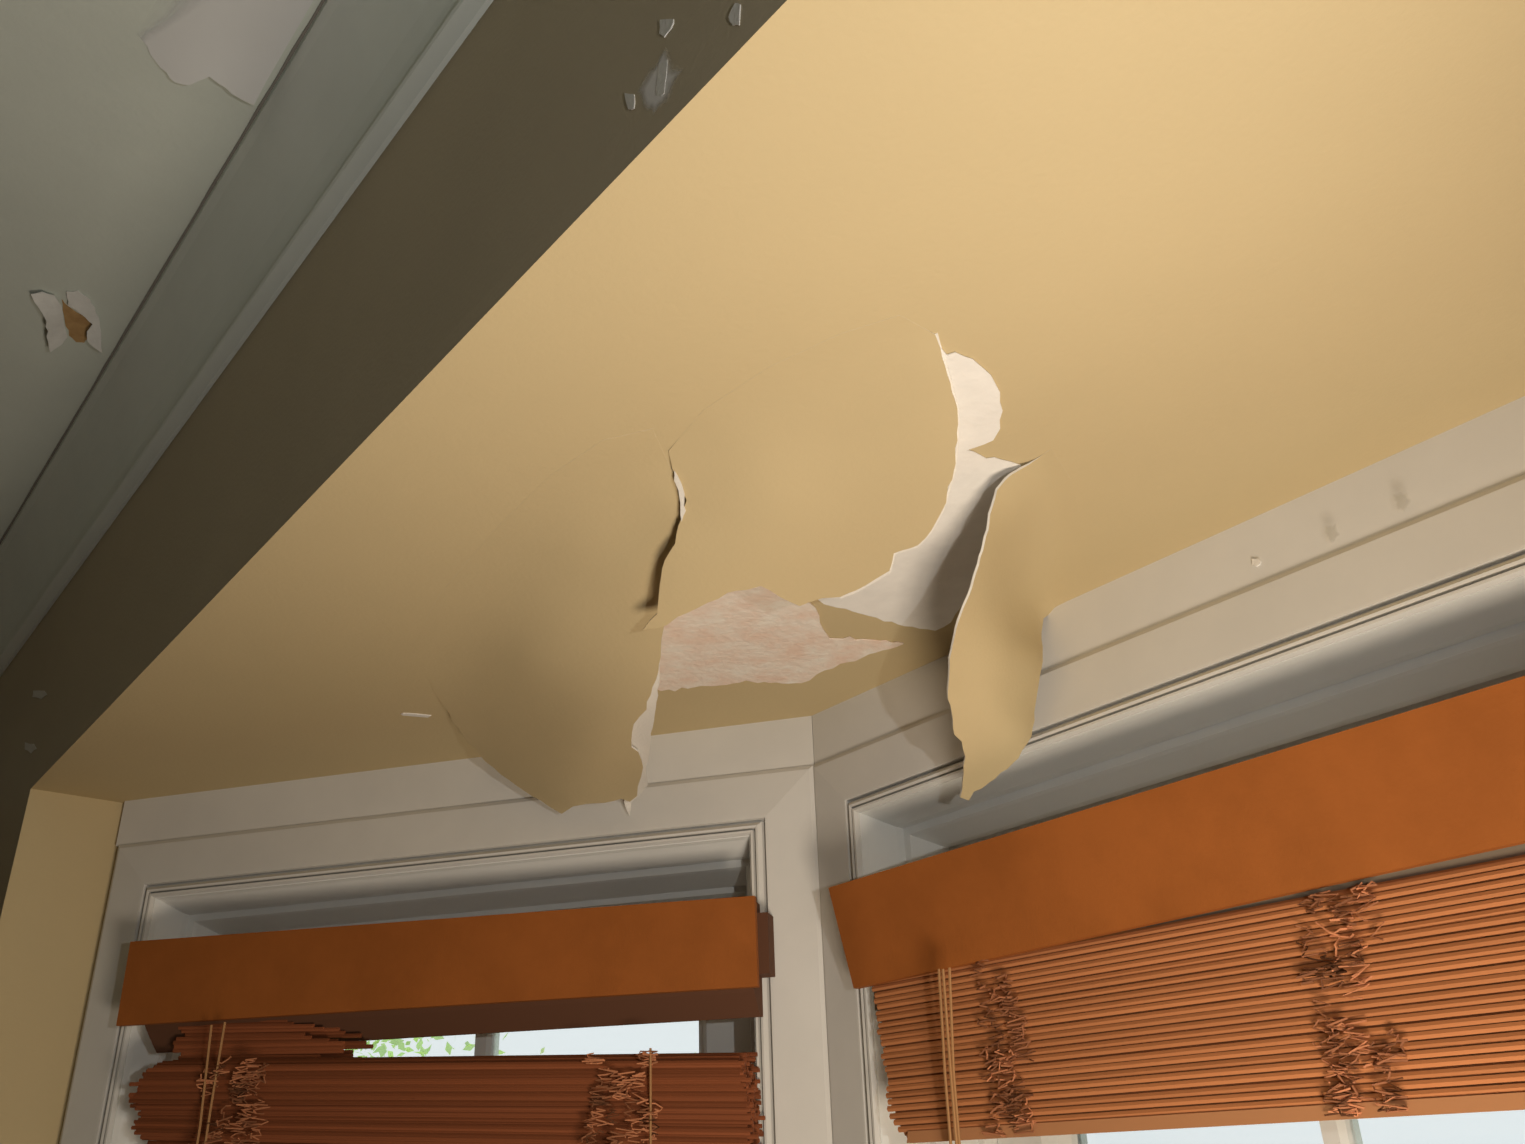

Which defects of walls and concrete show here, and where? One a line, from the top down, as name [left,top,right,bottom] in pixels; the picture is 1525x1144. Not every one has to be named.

peeling [142,0,313,105]
peeling [624,19,678,110]
peeling [728,3,741,26]
peeling [31,290,102,353]
peeling [409,315,1082,816]